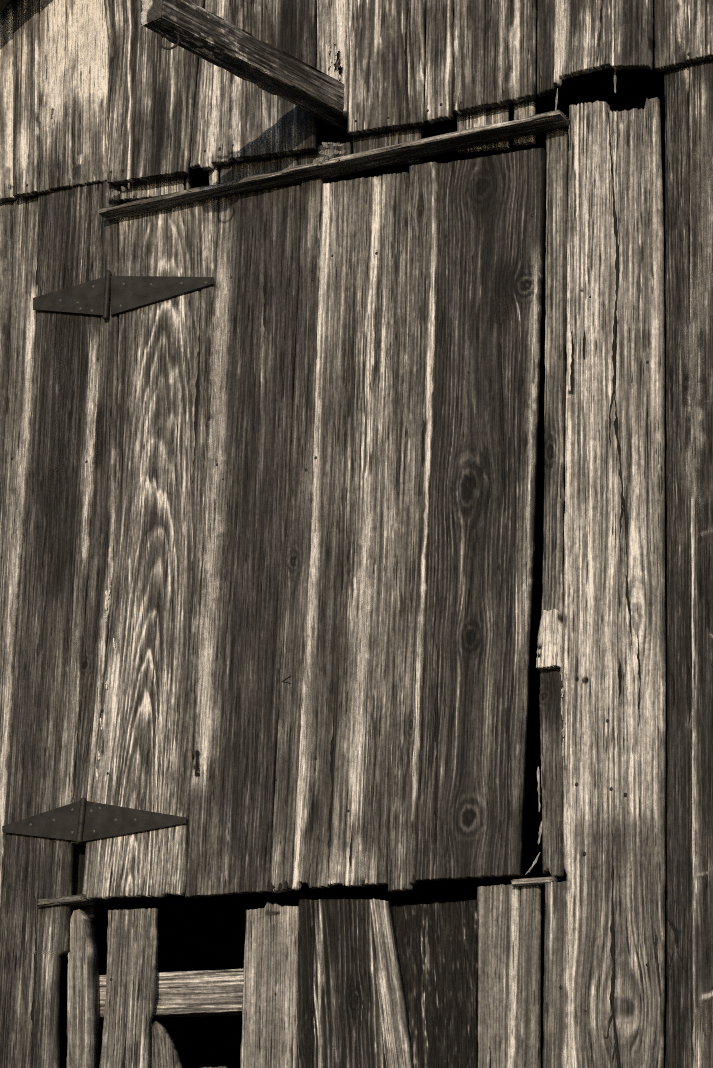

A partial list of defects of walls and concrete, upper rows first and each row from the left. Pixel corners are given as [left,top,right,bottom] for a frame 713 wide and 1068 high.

crack [570,331,586,394]
crack [607,106,641,725]